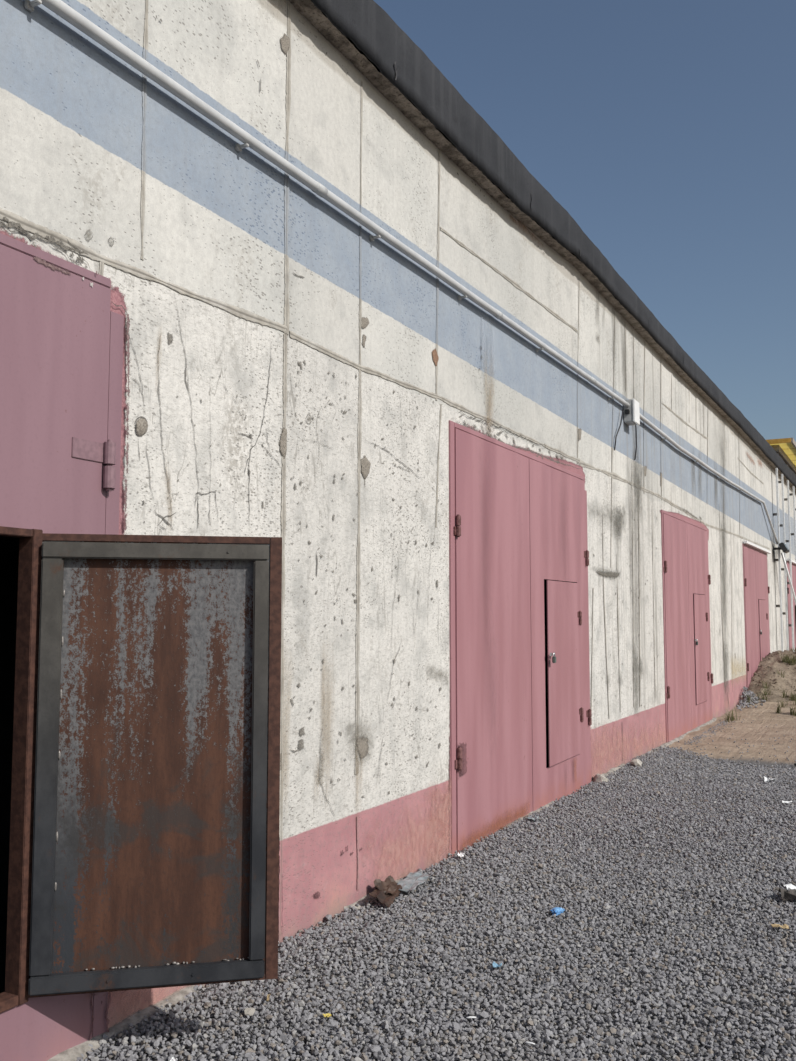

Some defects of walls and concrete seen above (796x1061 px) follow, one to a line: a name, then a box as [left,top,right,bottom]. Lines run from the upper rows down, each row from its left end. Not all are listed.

crack [111,293,219,527]
crack [240,362,279,522]
rust [28,533,282,998]